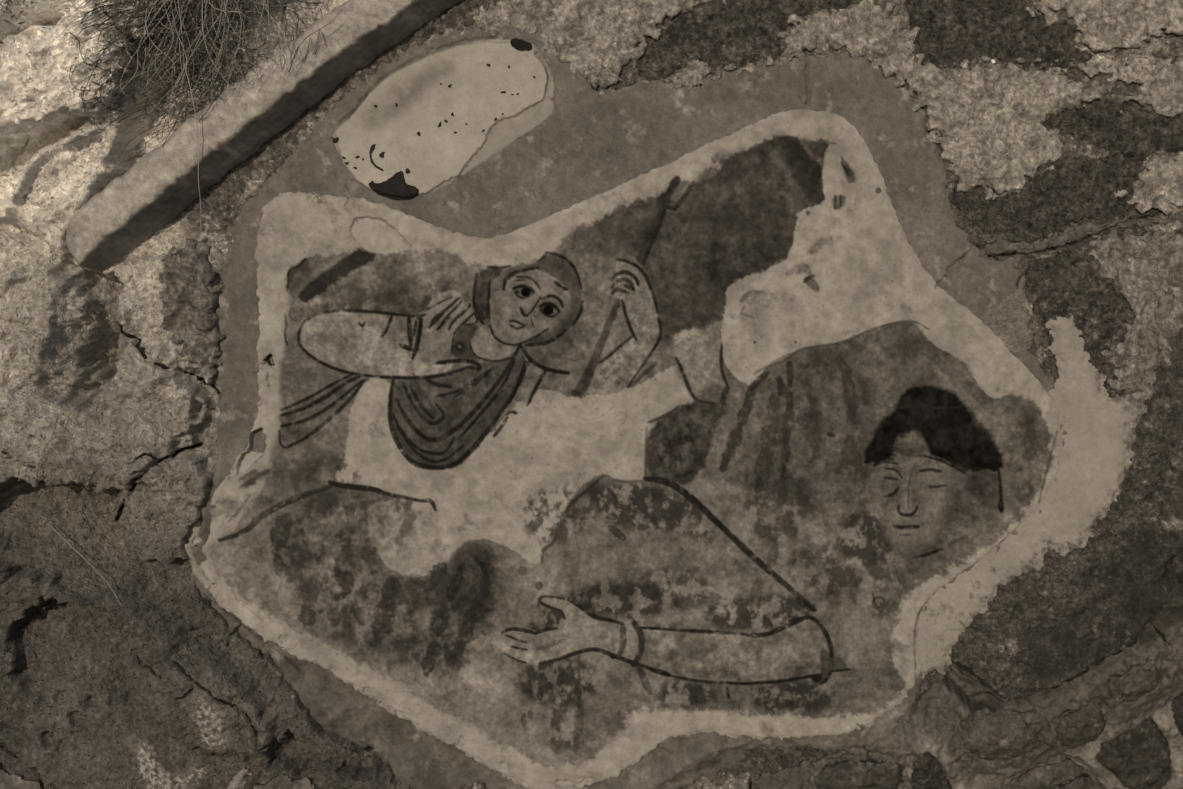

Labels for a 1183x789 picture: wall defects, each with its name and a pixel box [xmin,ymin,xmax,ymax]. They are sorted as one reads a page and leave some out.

spalling [637,0,863,80]
spalling [906,0,1092,70]
crack [1047,235,1090,251]
crack [119,324,221,394]
crack [131,649,258,737]